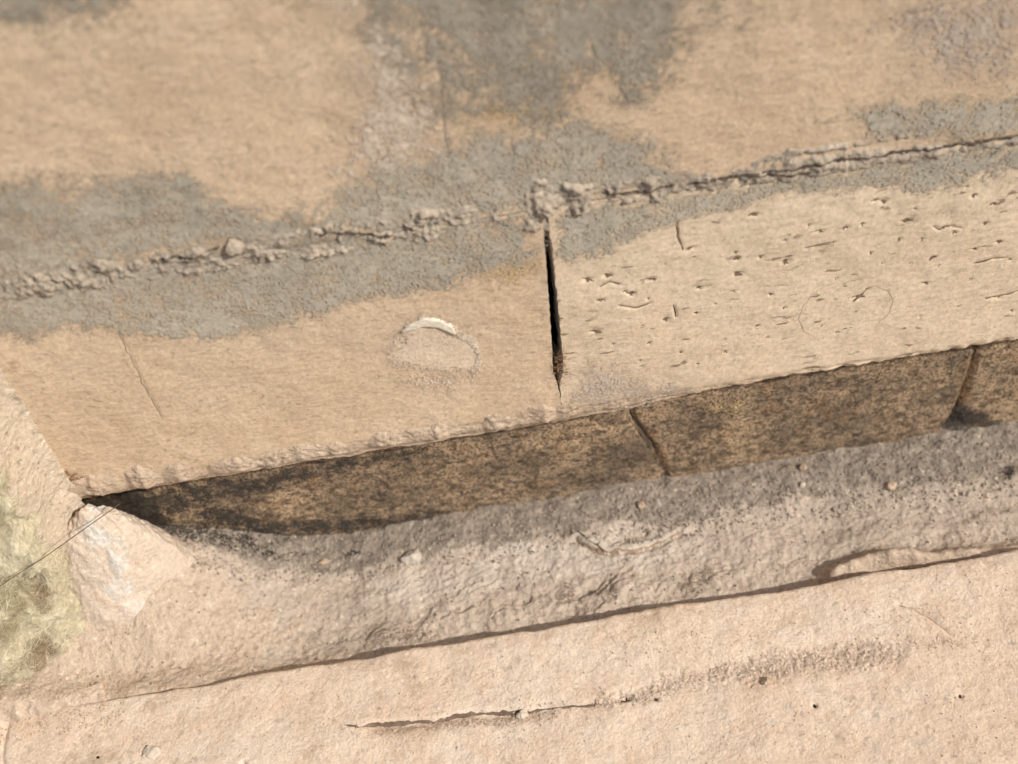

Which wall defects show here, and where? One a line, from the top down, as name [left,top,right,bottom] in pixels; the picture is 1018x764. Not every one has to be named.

damp [0,0,1018,347]
crack [602,135,1018,196]
crack [544,236,559,349]
flaking render [380,312,491,401]
crack [347,703,602,728]